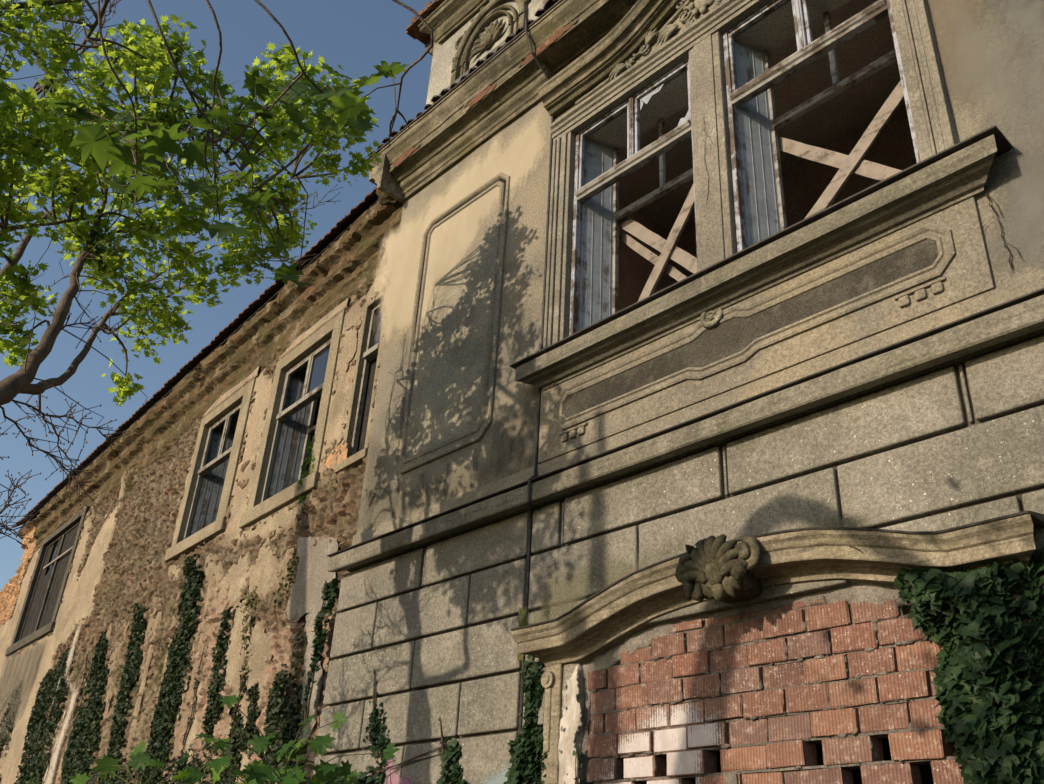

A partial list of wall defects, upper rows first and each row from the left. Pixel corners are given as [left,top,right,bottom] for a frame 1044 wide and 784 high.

flaking render [0,201,403,784]
crack [983,184,1023,270]